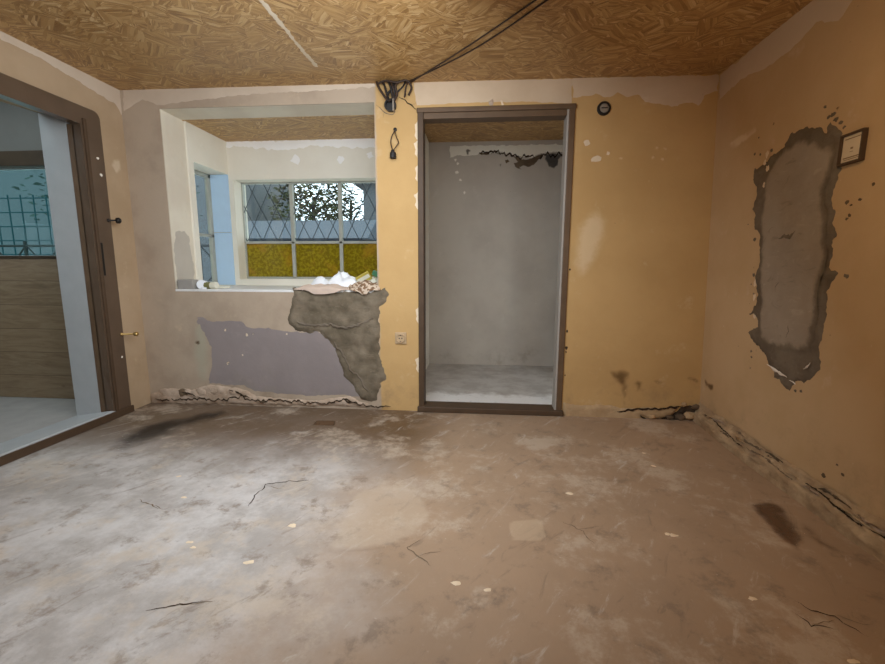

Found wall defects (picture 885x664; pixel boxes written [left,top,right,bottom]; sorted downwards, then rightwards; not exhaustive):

peeling [449,144,563,194]
peeling [151,317,391,408]
damp [131,414,217,440]
damp [755,503,798,544]
crack [146,601,212,611]